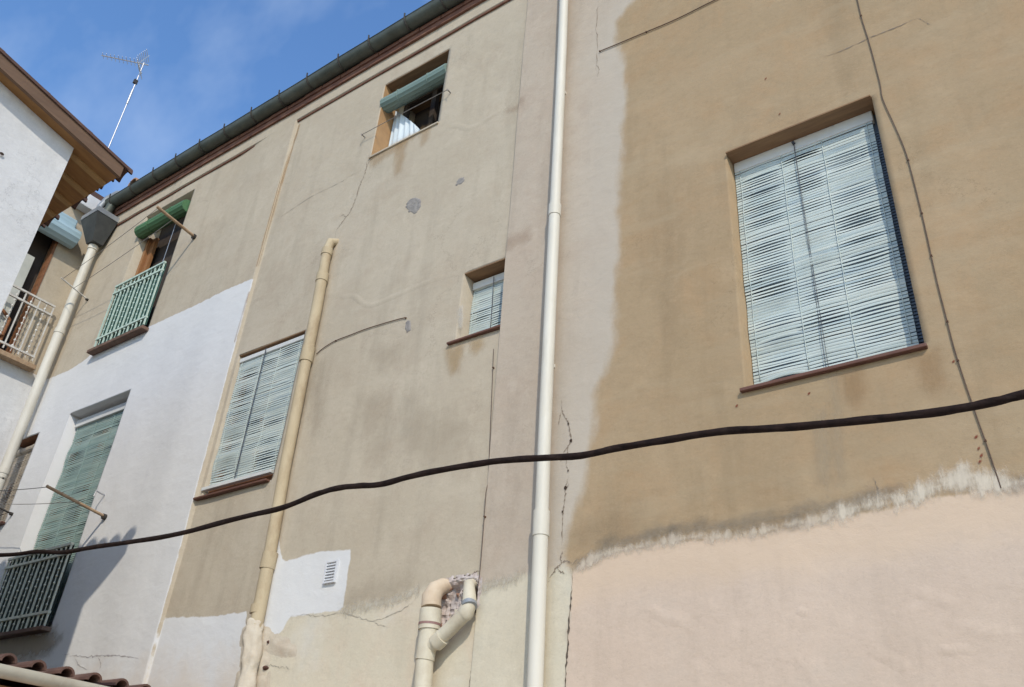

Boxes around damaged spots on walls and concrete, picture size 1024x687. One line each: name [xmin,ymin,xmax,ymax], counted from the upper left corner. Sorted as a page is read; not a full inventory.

crack [282,159,372,236]
spalling [405,198,421,214]
crack [548,401,577,687]